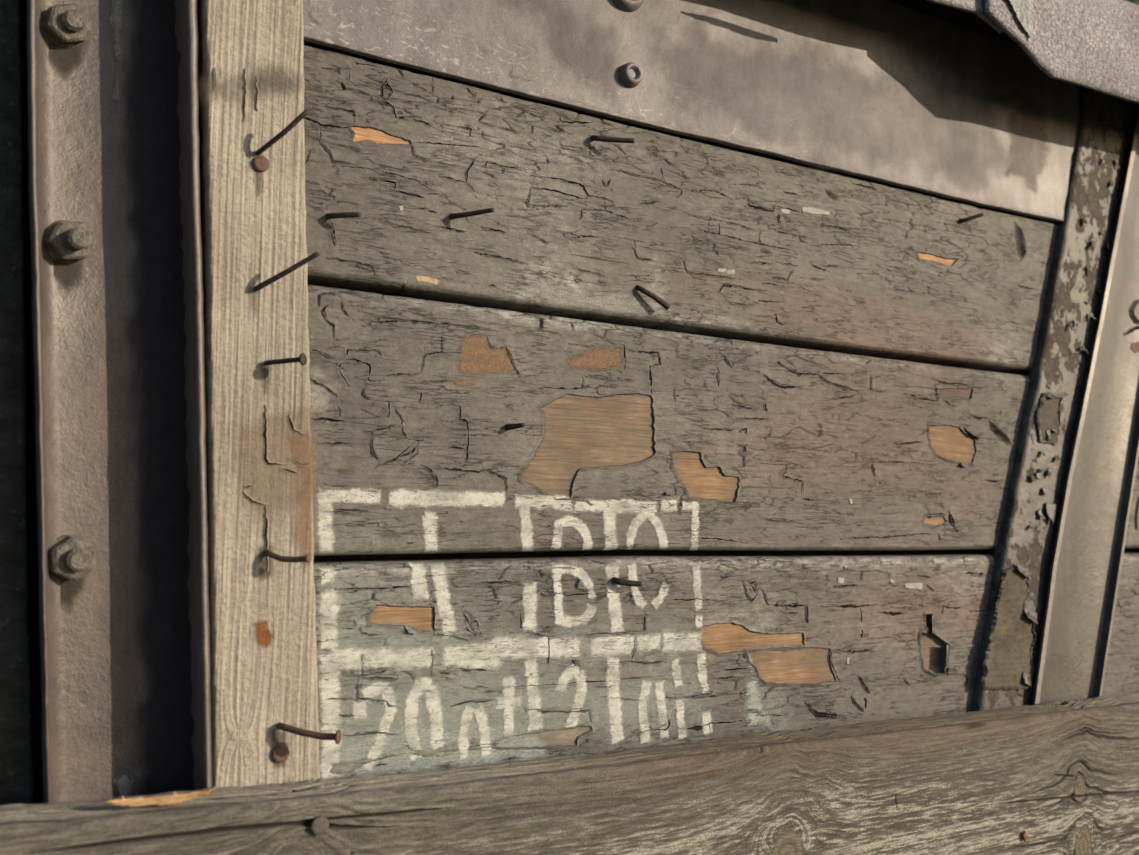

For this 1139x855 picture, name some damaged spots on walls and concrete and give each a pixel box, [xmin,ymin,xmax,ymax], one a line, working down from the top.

peeling [347,122,414,148]
crack [304,62,857,325]
crack [242,302,585,572]
peeling [516,390,742,505]
crack [623,345,680,402]
crack [703,354,988,452]
peeling [926,422,984,467]
corrosion [256,621,273,647]
crack [323,619,408,774]
peeling [366,601,438,637]
crack [430,575,907,732]
peeling [698,619,838,688]